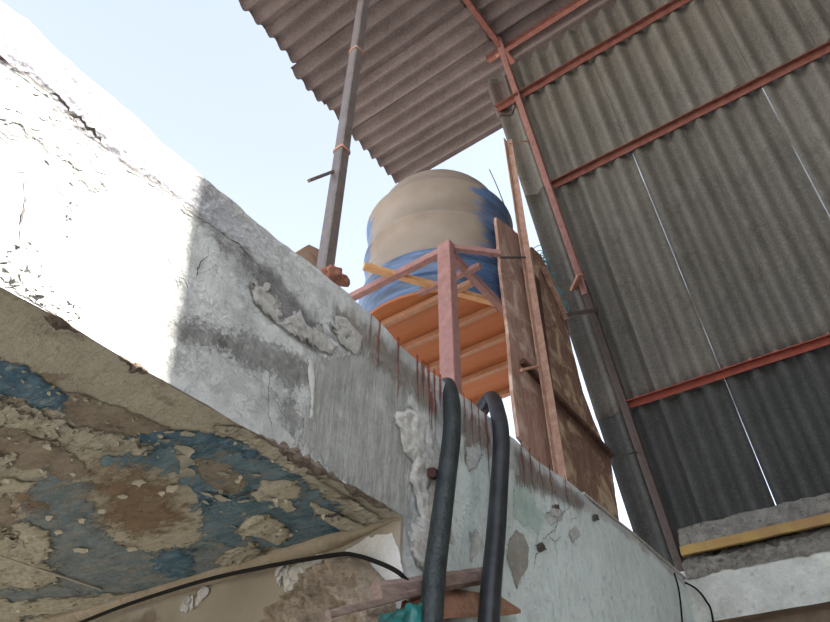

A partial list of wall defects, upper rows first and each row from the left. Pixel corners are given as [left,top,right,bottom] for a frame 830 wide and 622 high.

peeling [0,75,117,333]
crack [0,56,268,275]
crack [143,207,208,288]
peeling [0,277,412,622]
corrosion [417,355,442,423]
corrosion [463,393,489,465]
peeling [507,530,546,589]